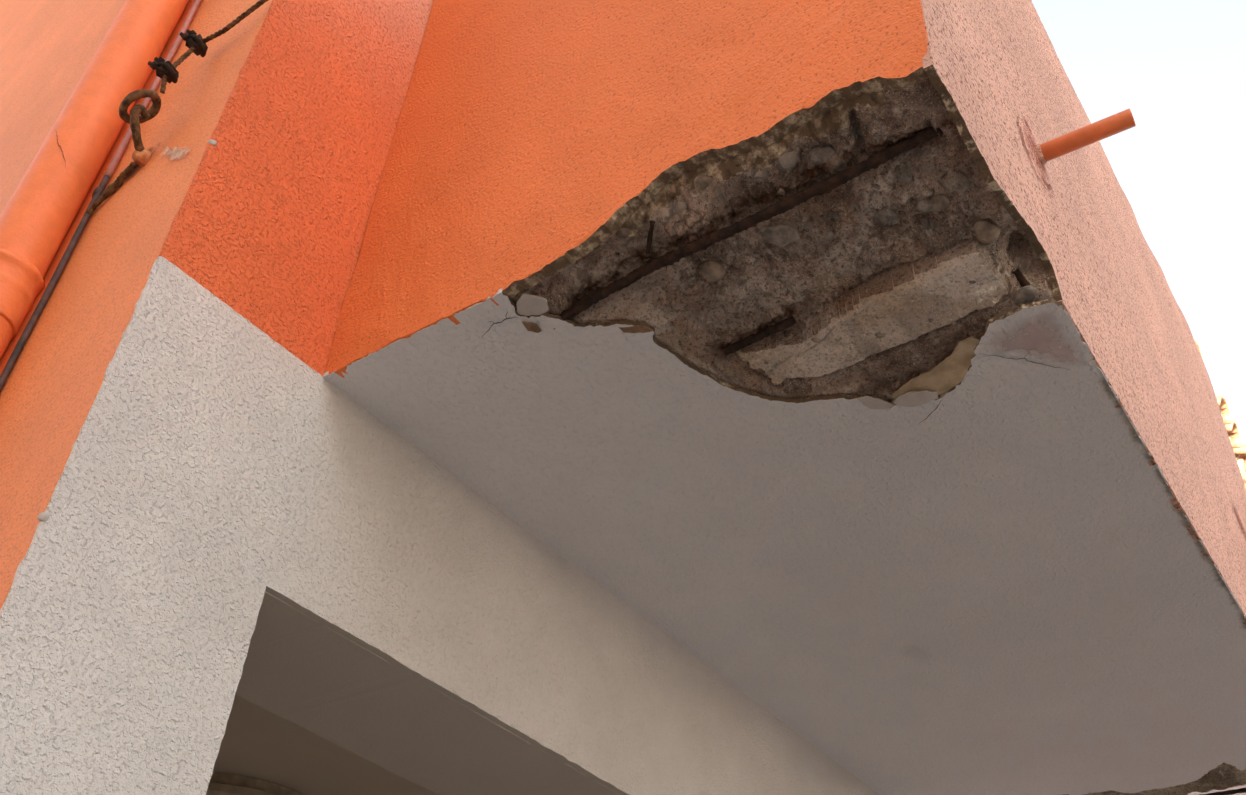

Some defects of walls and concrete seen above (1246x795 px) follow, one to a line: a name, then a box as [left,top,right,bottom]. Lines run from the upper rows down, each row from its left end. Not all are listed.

spalling [511,78,1053,409]
spalling [1083,763,1246,795]